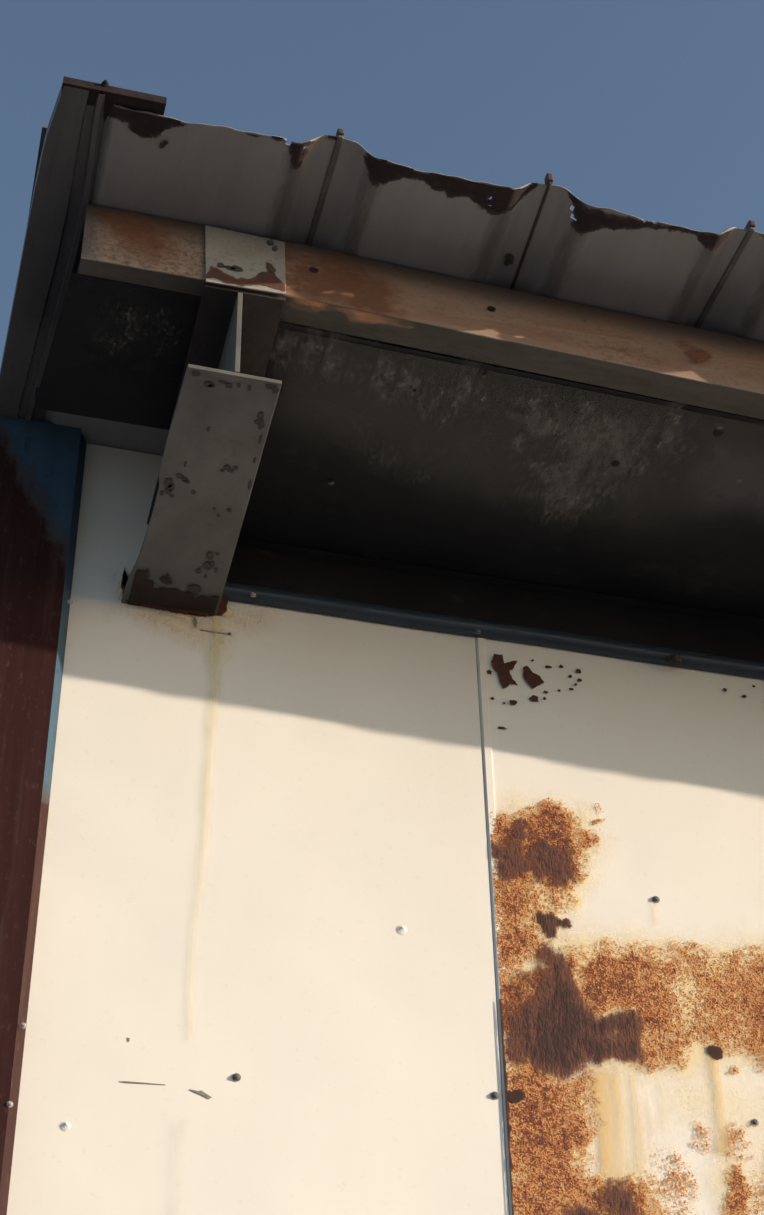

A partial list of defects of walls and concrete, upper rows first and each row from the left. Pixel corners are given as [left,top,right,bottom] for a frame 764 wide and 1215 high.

corrosion [107,104,187,149]
corrosion [363,152,538,215]
corrosion [567,191,732,252]
corrosion [206,262,286,291]
corrosion [118,568,233,633]
corrosion [490,797,764,1215]